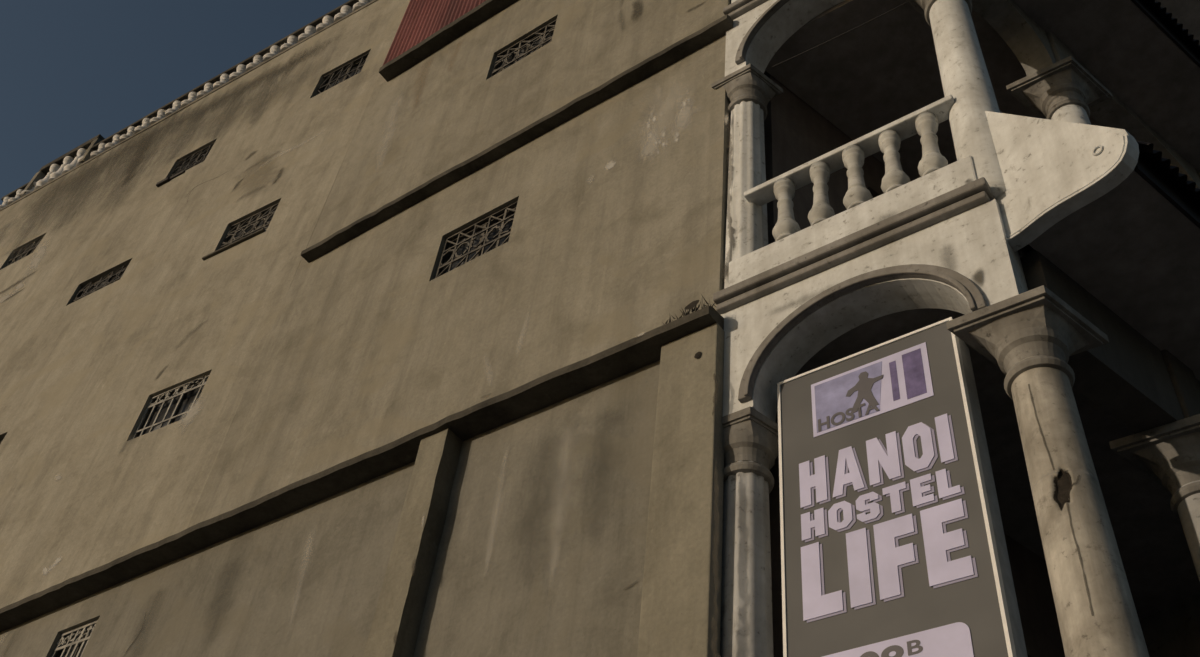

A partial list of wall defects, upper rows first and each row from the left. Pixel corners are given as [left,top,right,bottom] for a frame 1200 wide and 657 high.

flaking render [1028,384,1094,616]